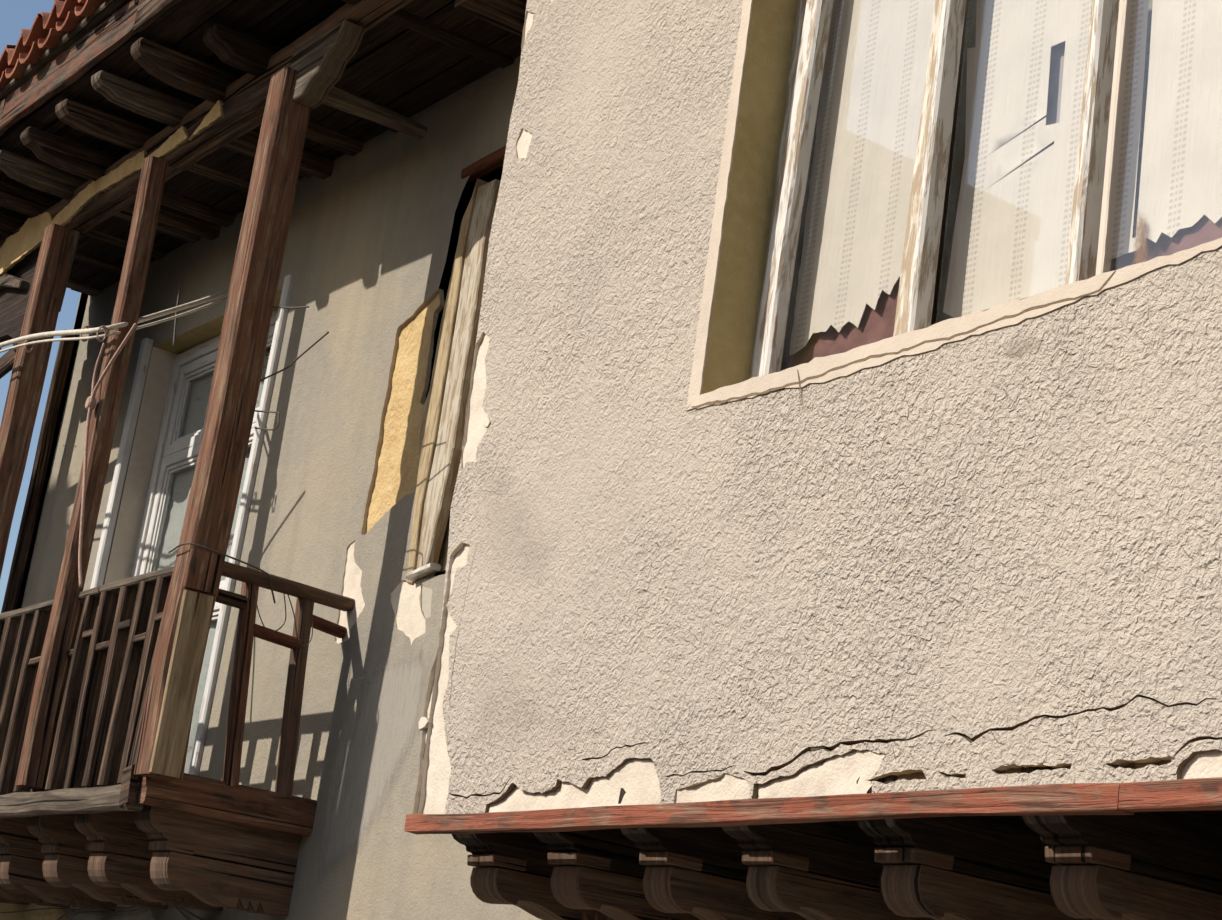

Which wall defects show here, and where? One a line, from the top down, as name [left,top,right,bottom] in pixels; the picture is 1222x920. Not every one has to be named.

flaking render [335,289,445,644]
flaking render [461,332,491,471]
flaking render [390,543,470,814]
crack [450,776,512,799]
crack [582,742,646,761]
crack [665,692,1222,777]